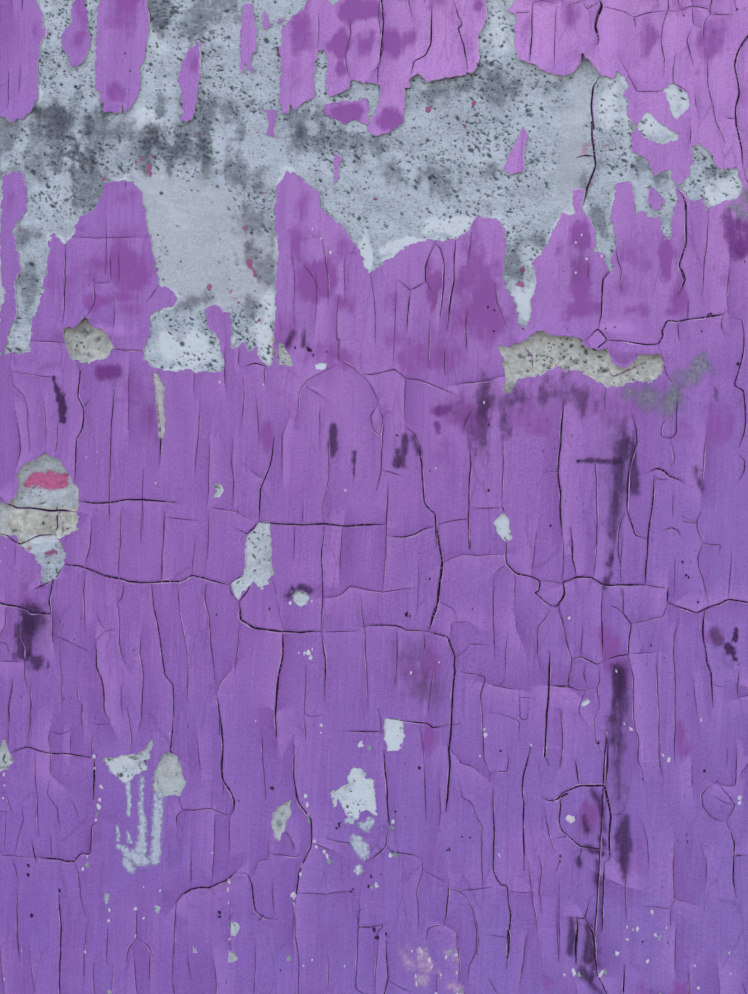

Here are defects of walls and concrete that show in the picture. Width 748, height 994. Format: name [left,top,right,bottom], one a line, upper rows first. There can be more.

peeling [0,0,743,394]
crack [586,187,747,477]
spalling [0,452,79,583]
peeling [231,521,275,600]
peeling [103,739,186,796]
peeling [331,766,378,820]
peeling [384,718,405,751]